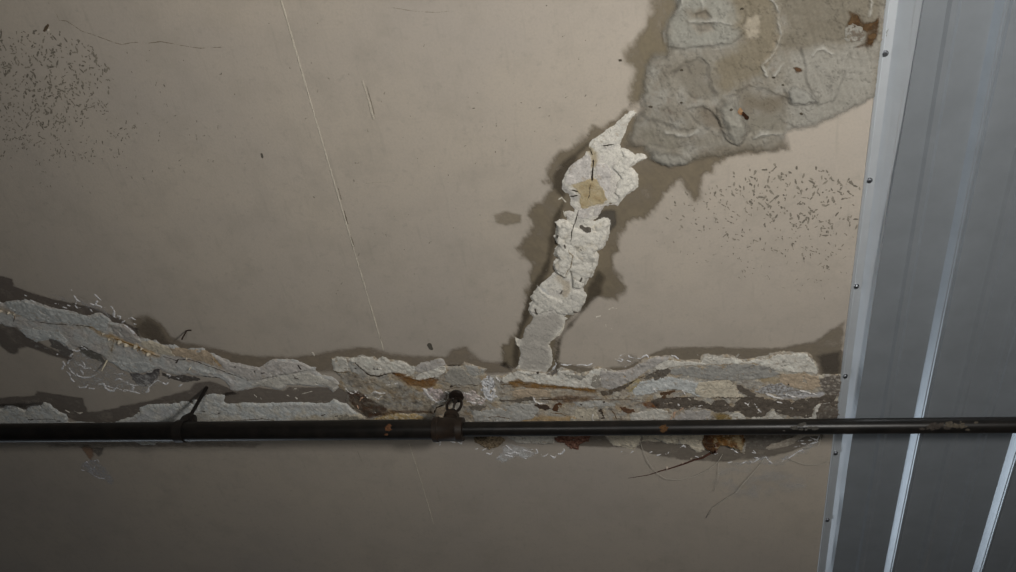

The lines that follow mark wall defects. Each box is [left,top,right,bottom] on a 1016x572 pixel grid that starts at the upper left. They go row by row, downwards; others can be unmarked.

leakage [0,0,843,423]
corrosion [395,373,437,387]
corrosion [508,379,596,402]
corrosion [554,436,591,450]
peeling [766,434,820,450]